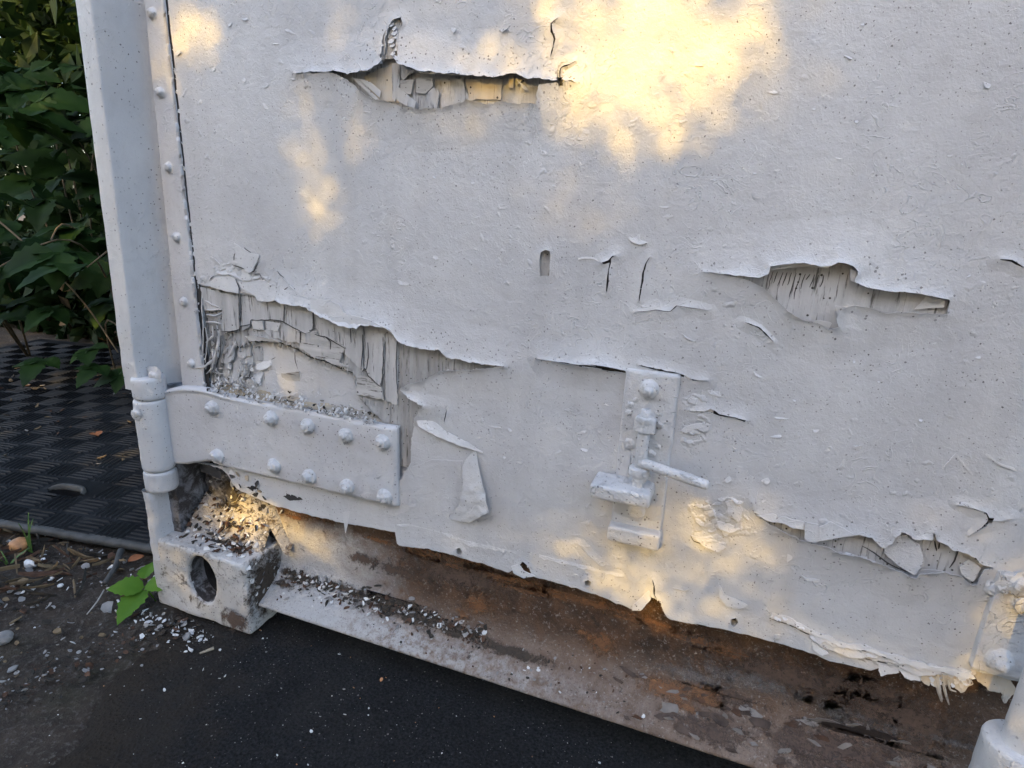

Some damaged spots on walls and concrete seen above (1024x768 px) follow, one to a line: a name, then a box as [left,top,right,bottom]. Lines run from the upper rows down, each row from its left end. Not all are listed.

peeling [271,8,611,158]
crack [542,7,579,88]
crack [527,245,779,435]
peeling [667,216,992,366]
corrosion [195,517,267,555]
corrosion [276,507,331,523]
peeling [397,420,489,523]
peeling [687,476,1024,620]
crack [944,453,1023,538]
corrosion [221,609,249,631]
corrosion [350,535,977,768]
peeling [769,613,1016,703]